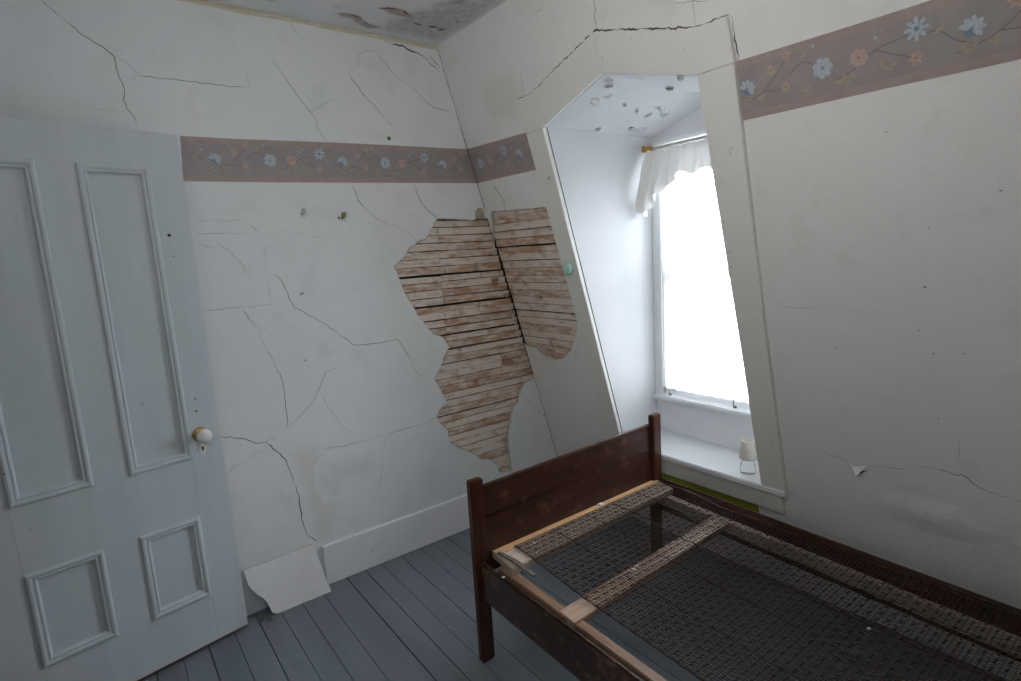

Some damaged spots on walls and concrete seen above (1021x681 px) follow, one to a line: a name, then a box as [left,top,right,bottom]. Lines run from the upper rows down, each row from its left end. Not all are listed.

crack [44,3,244,118]
crack [348,39,505,212]
leakage [374,0,507,45]
peeling [551,75,702,138]
crack [197,220,435,541]